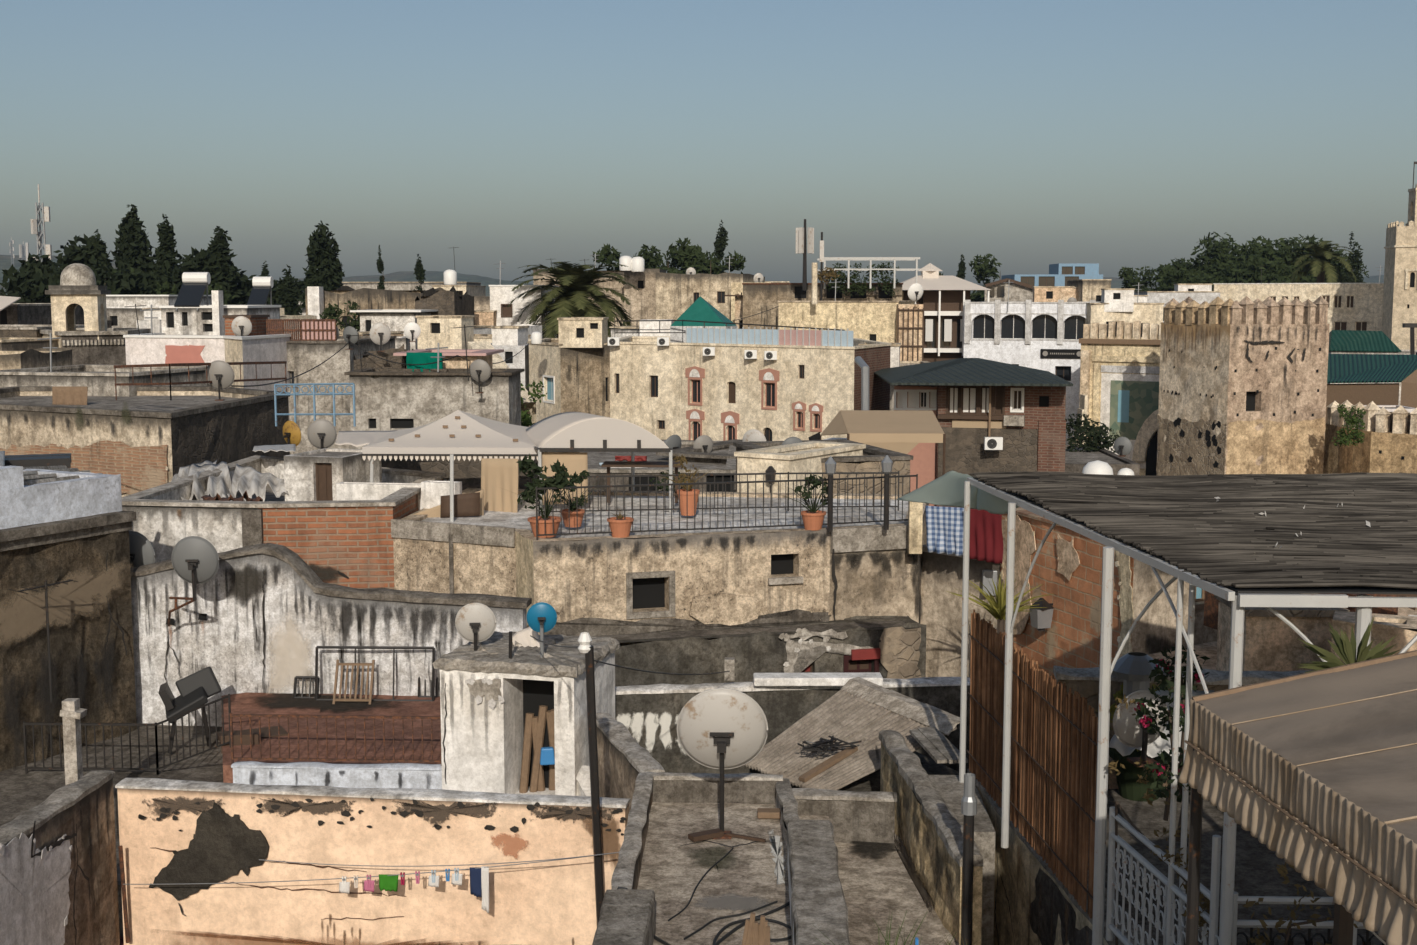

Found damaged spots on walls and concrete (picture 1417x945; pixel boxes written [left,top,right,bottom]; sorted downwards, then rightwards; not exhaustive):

damp [137,564,279,646]
damp [309,564,340,583]
damp [257,593,456,713]
spalling [544,609,922,679]
peeling [138,796,239,840]
peeling [251,797,626,835]
peeling [0,833,72,945]